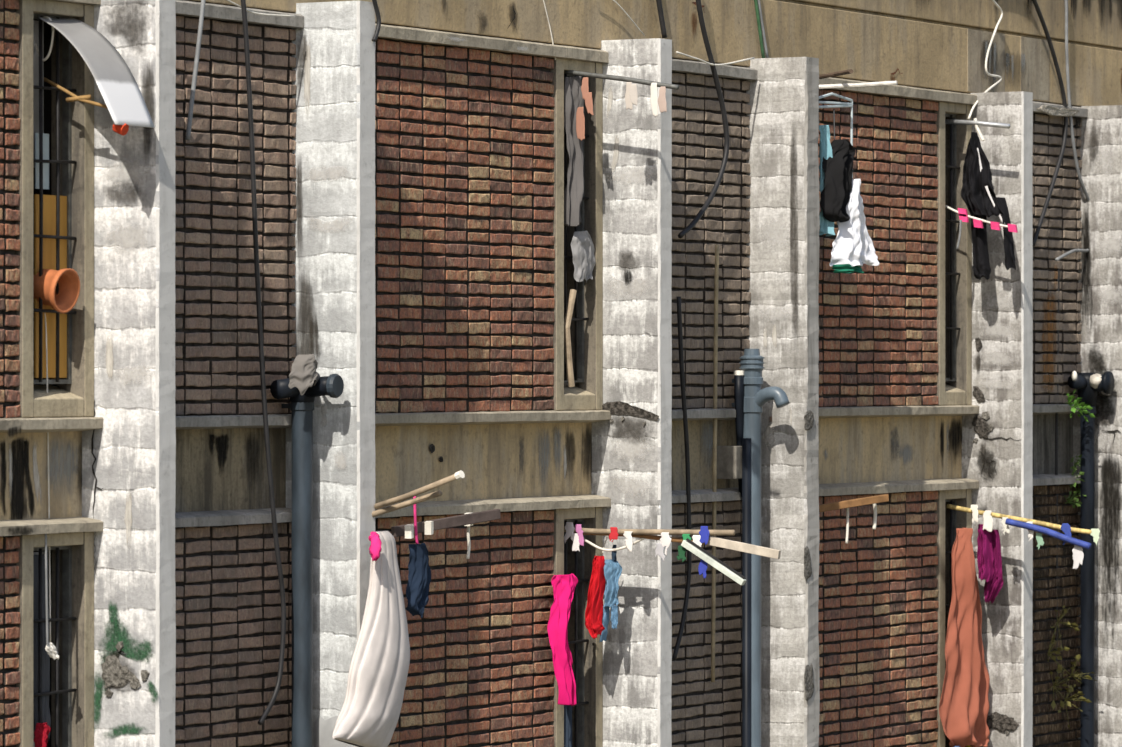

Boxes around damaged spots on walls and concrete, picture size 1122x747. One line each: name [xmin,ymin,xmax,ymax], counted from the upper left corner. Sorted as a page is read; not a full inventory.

leakage [1071,0,1122,21]
leakage [1090,136,1112,174]
leakage [1081,212,1122,323]
leakage [986,325,1010,337]
leakage [1088,349,1106,375]
leakage [941,421,962,465]
leakage [0,427,82,535]
crack [91,400,107,573]
leakage [977,449,996,478]
leakage [1095,390,1121,634]
leakage [109,604,119,632]